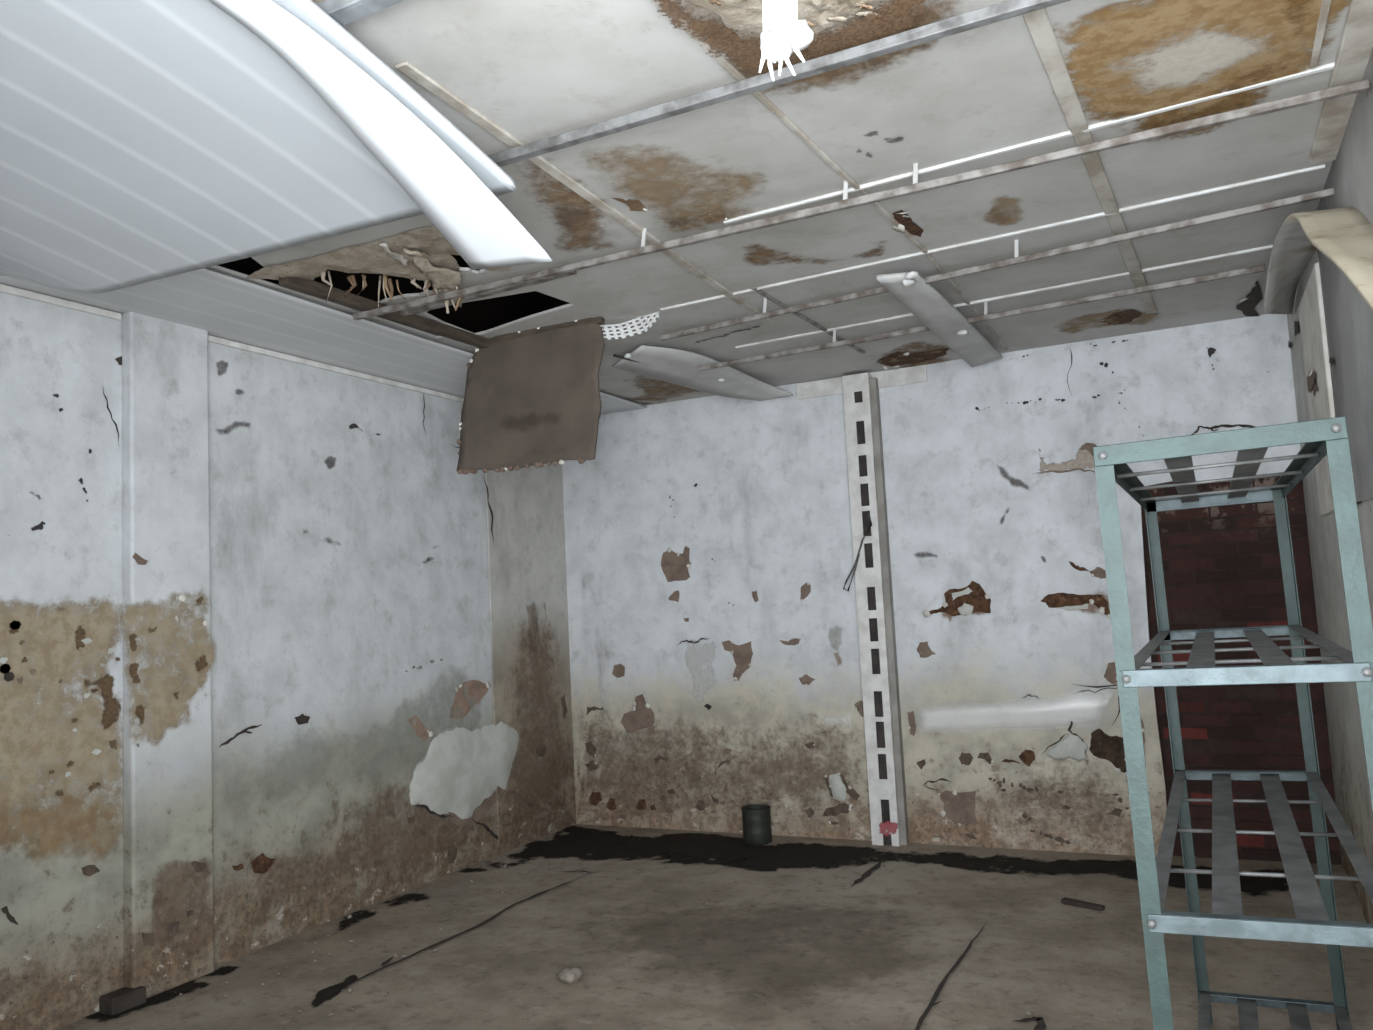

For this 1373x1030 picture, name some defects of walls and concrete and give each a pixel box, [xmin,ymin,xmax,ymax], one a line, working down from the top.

peeling [807,4,877,40]
leakage [1054,0,1351,141]
leakage [531,167,611,250]
spalling [922,581,991,618]
spalling [1041,561,1111,620]
spalling [722,640,753,681]
peeling [0,593,215,844]
leakage [458,725,1138,880]
leakage [1168,865,1212,890]
leakage [1240,869,1289,896]
leakage [84,966,238,1022]
crack [915,921,987,1030]